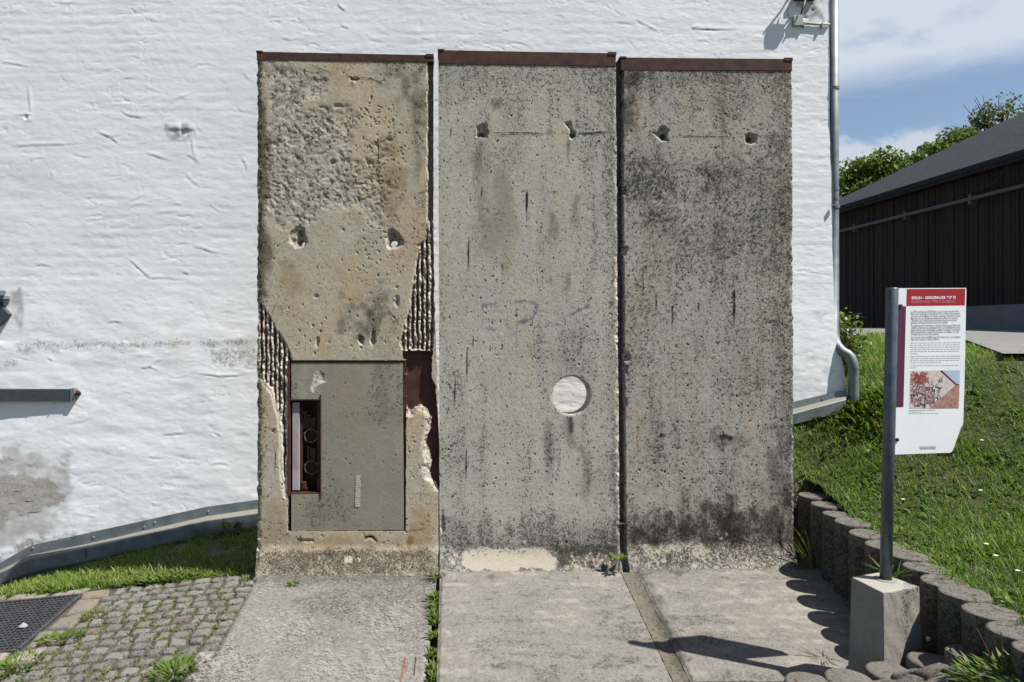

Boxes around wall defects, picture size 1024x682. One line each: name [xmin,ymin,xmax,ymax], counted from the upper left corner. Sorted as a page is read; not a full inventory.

spalling [475,122,490,138]
spalling [563,120,577,141]
spalling [652,125,671,142]
spalling [262,64,436,353]
spalling [257,299,293,496]
spalling [406,404,439,492]